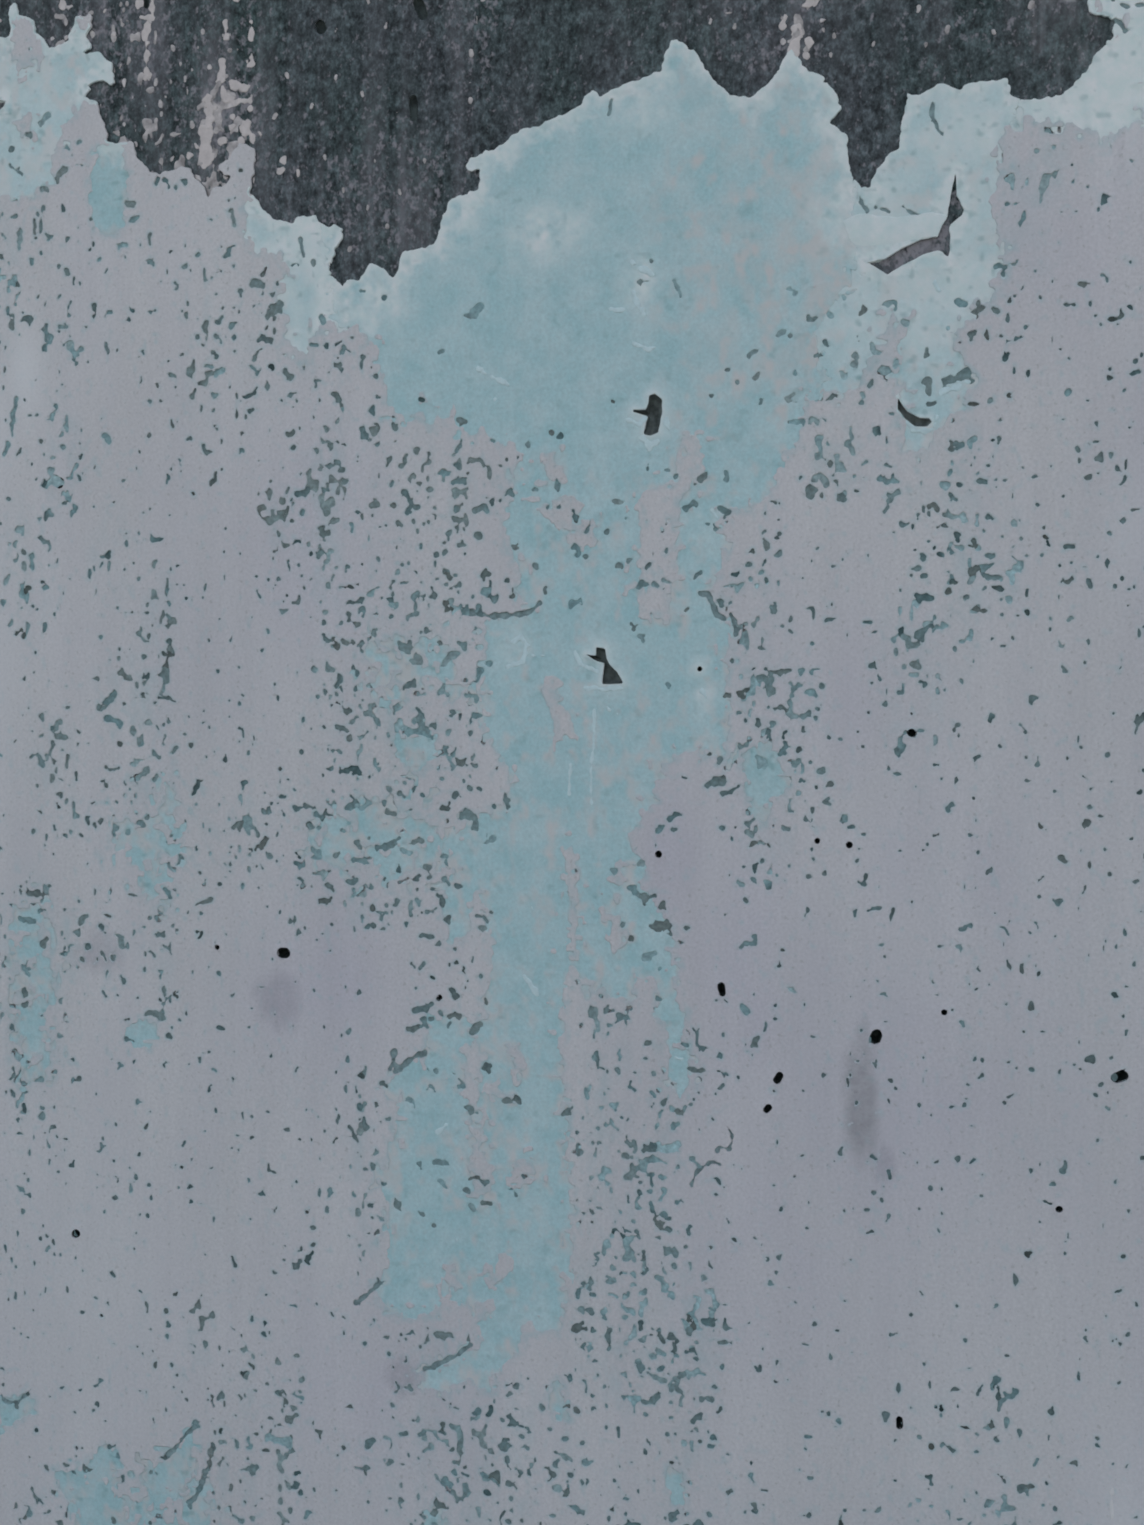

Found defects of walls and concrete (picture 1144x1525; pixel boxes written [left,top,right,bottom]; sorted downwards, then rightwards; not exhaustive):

spalling [1063,274,1133,326]
spalling [28,532,228,855]
spalling [886,712,961,787]
spalling [267,906,333,960]
spalling [715,982,777,1056]
spalling [0,956,82,1184]
spalling [763,1072,783,1113]
spalling [846,1021,897,1105]
spalling [1058,1041,1128,1111]
spalling [272,1187,334,1274]
spalling [922,1362,1022,1453]
spalling [908,1458,1062,1525]